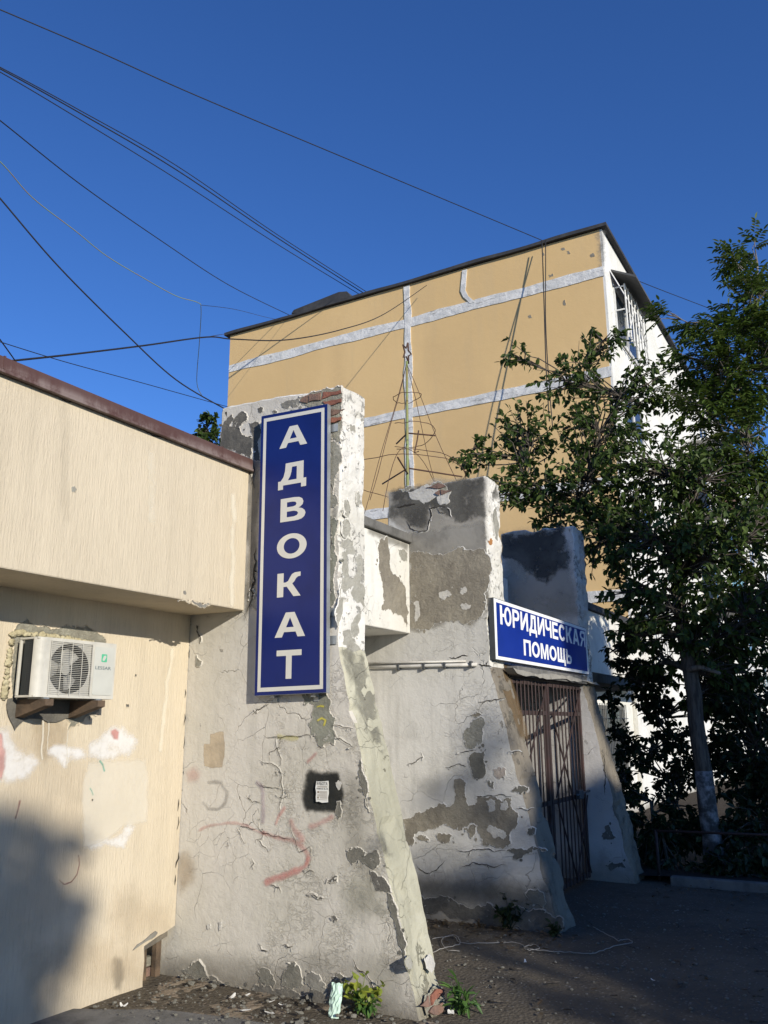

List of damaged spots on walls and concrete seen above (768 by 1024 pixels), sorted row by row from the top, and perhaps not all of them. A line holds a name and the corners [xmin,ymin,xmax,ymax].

peeling [219,385,499,652]
leakage [501,525,570,582]
crack [226,703,354,894]
crack [408,749,476,770]
peeling [403,711,556,862]
crack [475,794,534,811]
crack [416,847,506,875]
crack [258,943,294,952]
spalling [346,846,447,1017]
spalling [177,958,368,1010]